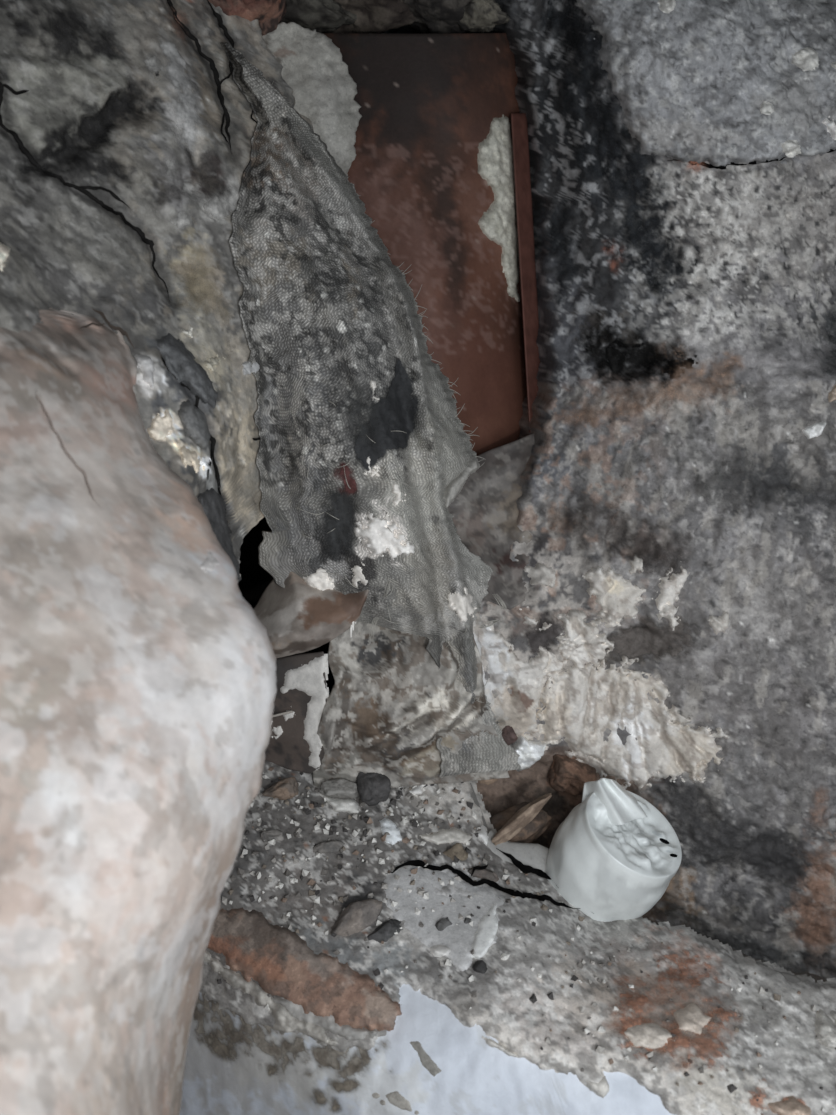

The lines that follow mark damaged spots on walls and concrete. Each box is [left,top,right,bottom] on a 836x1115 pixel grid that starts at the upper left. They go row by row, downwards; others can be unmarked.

leakage [791,47,836,71]
crack [0,82,169,298]
crack [667,157,785,170]
leakage [781,140,801,158]
leakage [822,116,836,140]
flaking render [351,479,415,587]
flaking render [303,568,335,591]
flaking render [447,554,730,793]
crack [385,848,594,914]
flaking render [200,654,836,1115]
rust [615,947,737,1068]
rust [750,1088,766,1109]